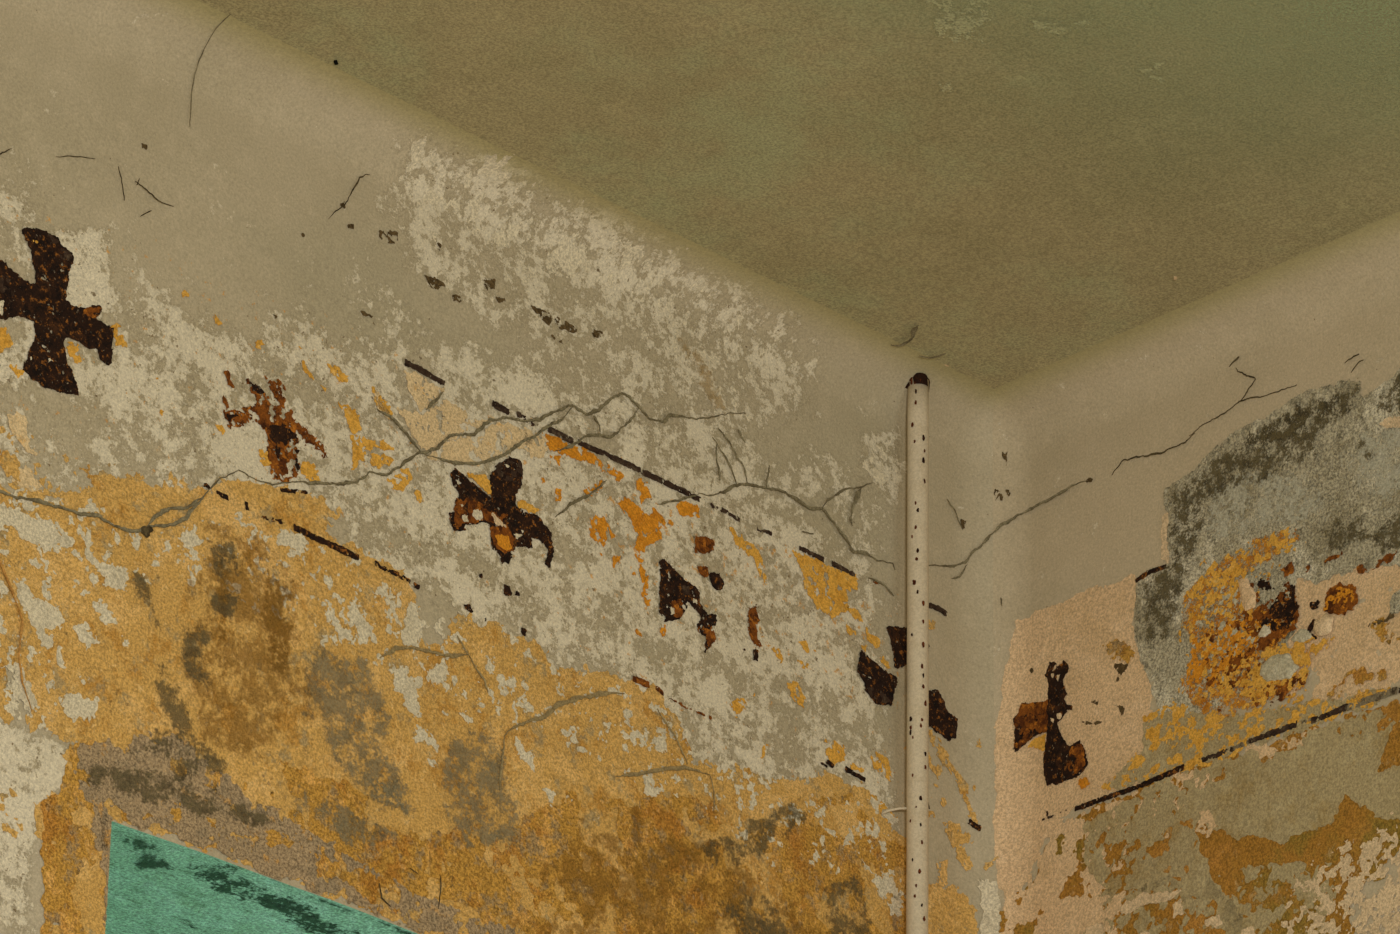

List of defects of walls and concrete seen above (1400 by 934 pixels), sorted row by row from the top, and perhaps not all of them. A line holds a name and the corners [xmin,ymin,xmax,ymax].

damp [87,627,274,827]
crack [0,391,895,596]
peeling [0,410,906,934]
rust [454,497,514,554]
peeling [372,370,700,606]
crack [499,690,625,791]
rust [1014,699,1048,748]
crack [929,356,1297,579]
peeling [928,368,1400,934]
damp [1143,384,1360,649]
rust [1177,526,1397,727]
damp [123,835,359,934]